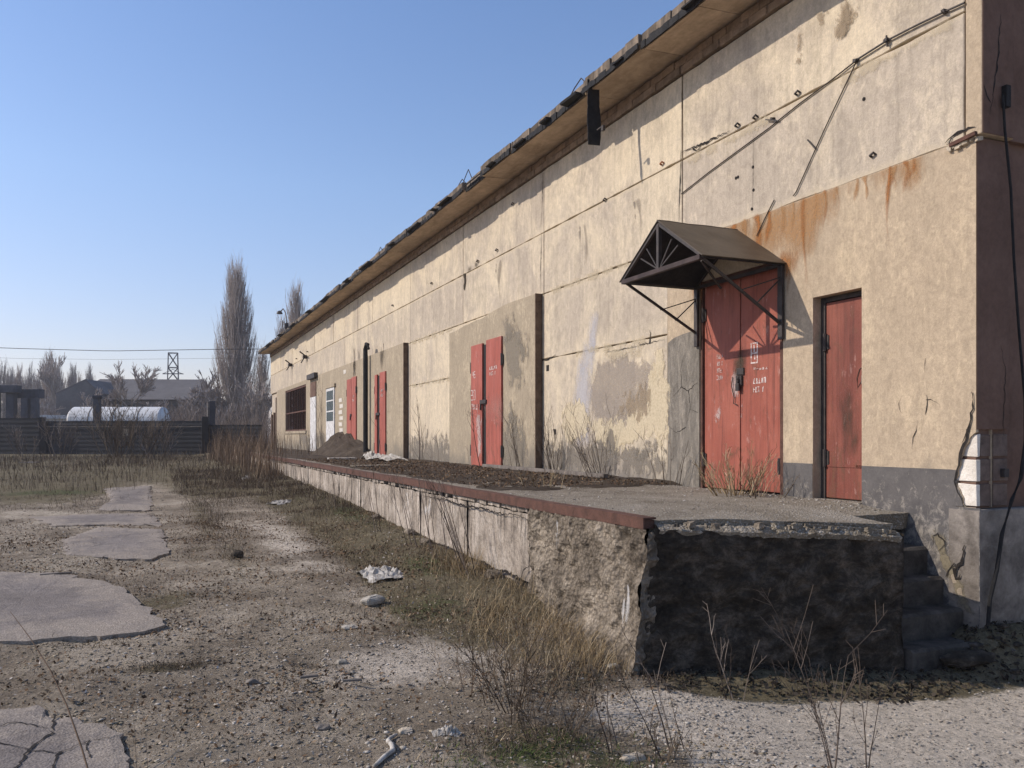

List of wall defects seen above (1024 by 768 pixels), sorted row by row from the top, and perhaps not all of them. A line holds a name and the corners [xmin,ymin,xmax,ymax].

crack [945,17,1001,145]
rust [886,158,919,204]
rust [730,188,837,276]
spalling [952,429,1008,508]